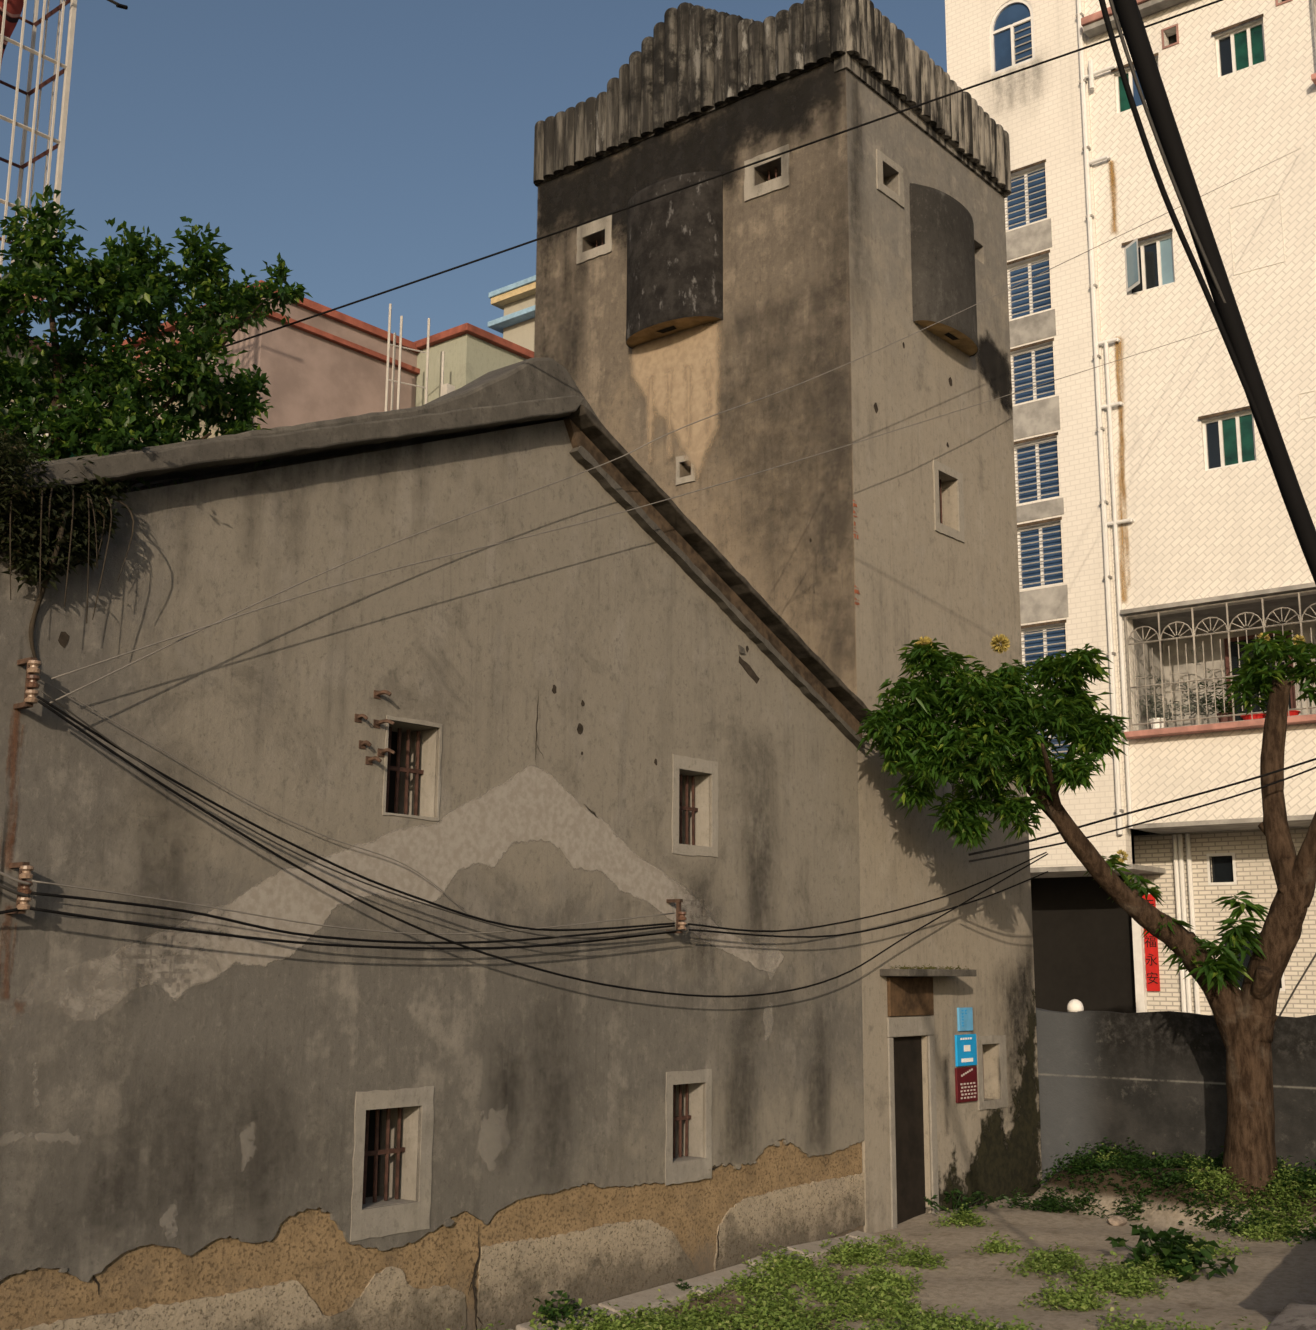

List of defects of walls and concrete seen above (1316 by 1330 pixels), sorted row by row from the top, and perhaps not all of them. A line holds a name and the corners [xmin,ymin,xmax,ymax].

water stain [938,959,1042,1212]
flaking render [0,1139,862,1330]